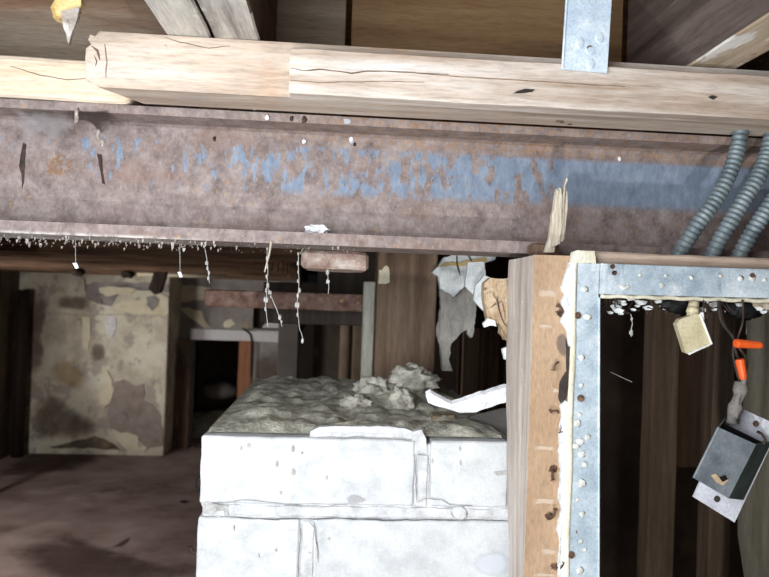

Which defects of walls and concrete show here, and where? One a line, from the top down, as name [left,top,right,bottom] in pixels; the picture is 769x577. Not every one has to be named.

spalling [85,281,169,337]
peeling [178,272,211,328]
water stain [37,398,91,436]
spalling [51,370,164,451]
crack [202,436,507,576]